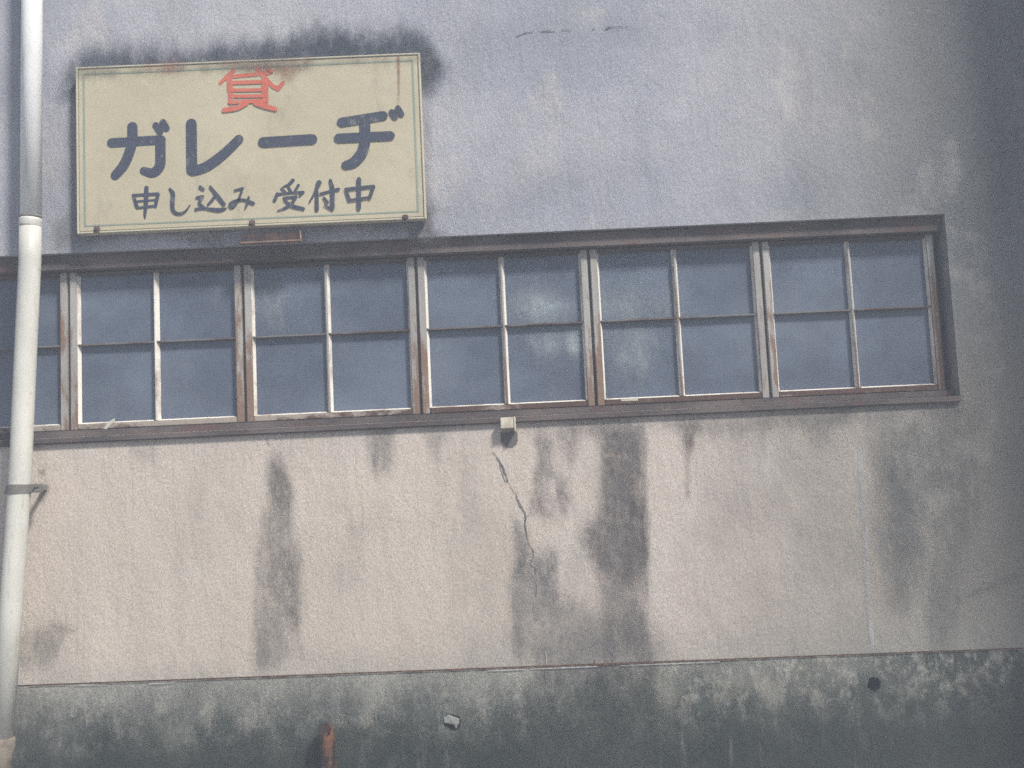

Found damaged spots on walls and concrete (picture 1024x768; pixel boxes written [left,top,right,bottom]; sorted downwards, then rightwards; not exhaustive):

damp [69,35,437,86]
crack [30,452,1024,686]